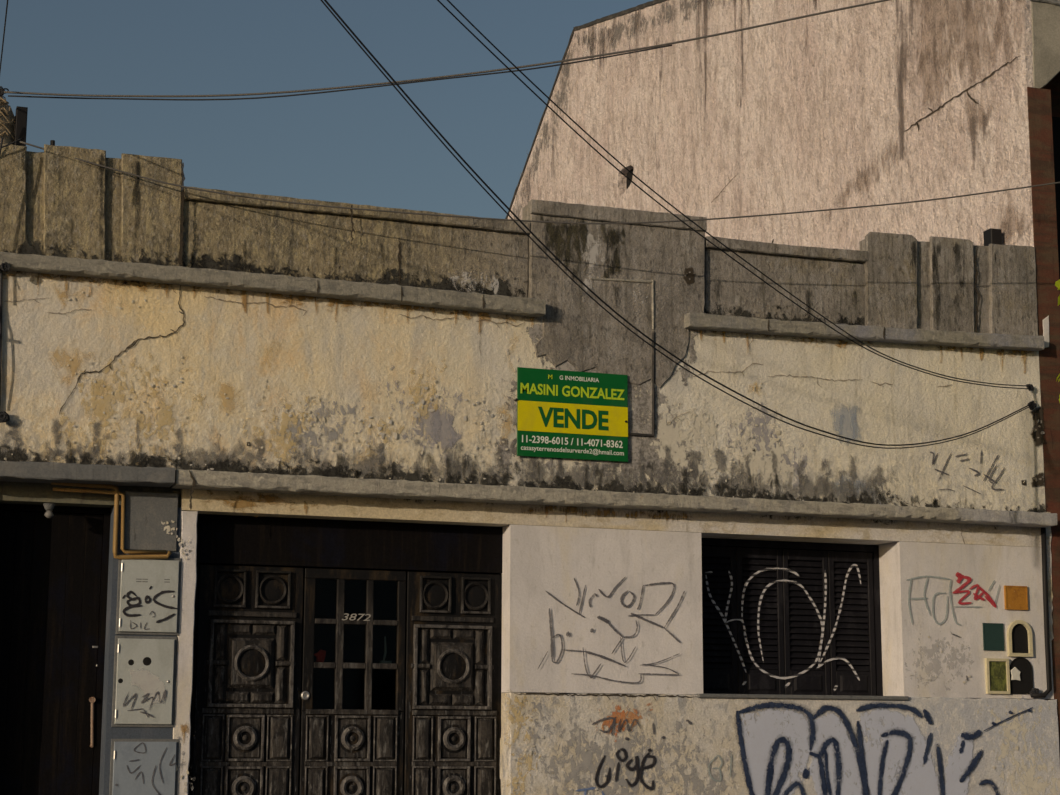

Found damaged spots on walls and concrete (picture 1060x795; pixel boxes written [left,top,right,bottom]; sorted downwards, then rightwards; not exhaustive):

water stain [513,0,713,218]
water stain [842,0,1020,205]
crack [903,55,1021,132]
crack [59,163,185,414]
crack [206,281,319,316]
water stain [1,236,528,298]
corrosion [266,293,490,333]
peeling [526,317,600,373]
peeling [54,353,194,464]
peeling [221,359,447,469]
water stain [0,369,985,509]
peeling [542,380,794,498]